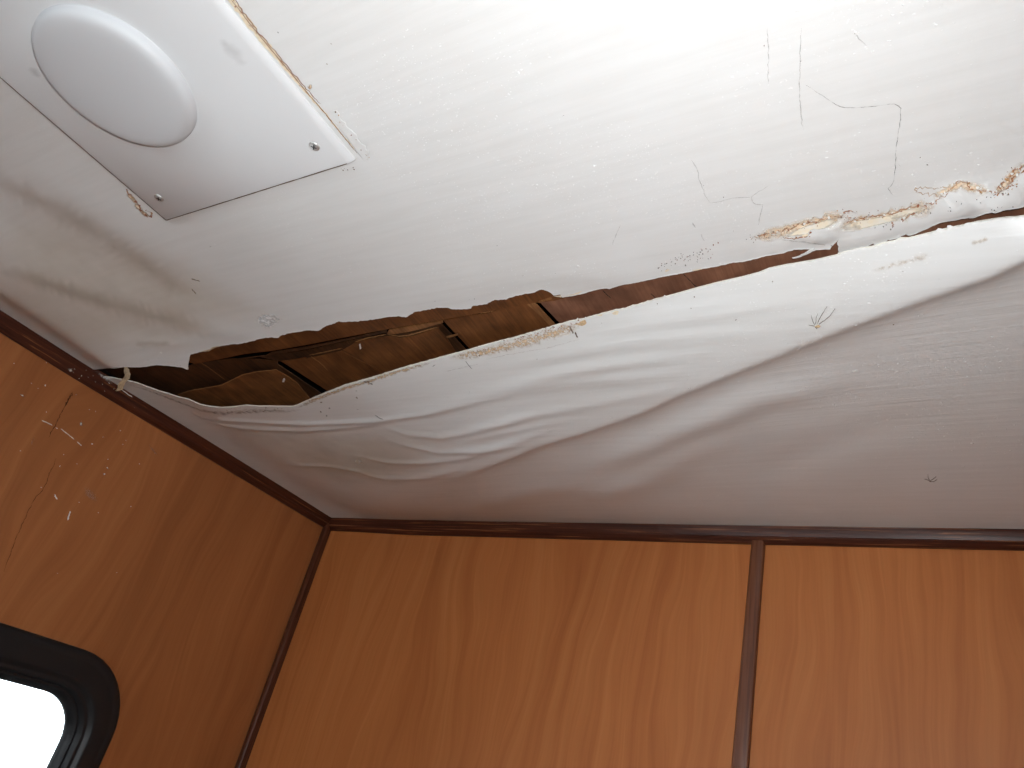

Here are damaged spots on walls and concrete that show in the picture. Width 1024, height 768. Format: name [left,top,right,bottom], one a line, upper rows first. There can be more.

peeling [750,165,1024,255]